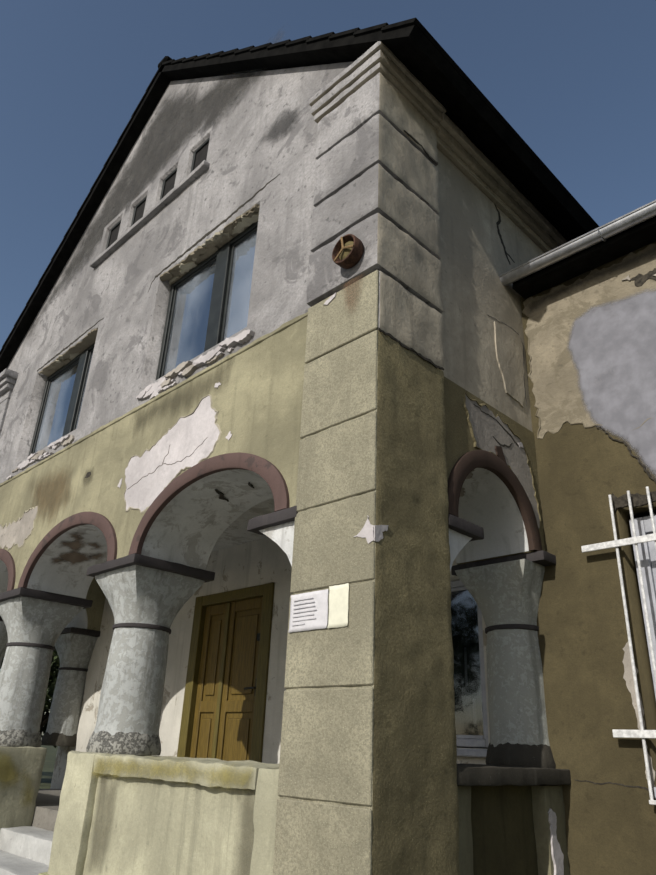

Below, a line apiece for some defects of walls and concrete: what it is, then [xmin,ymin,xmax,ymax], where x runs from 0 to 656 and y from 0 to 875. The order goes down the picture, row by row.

leakage [267,112,296,139]
crack [404,130,438,165]
crack [494,204,515,265]
peeling [522,243,656,439]
peeling [117,383,233,514]
peeling [462,392,541,532]
peeling [0,506,38,551]
spalling [354,515,389,544]
peeling [622,642,645,730]
peeling [645,744,656,787]
peeling [548,808,564,875]